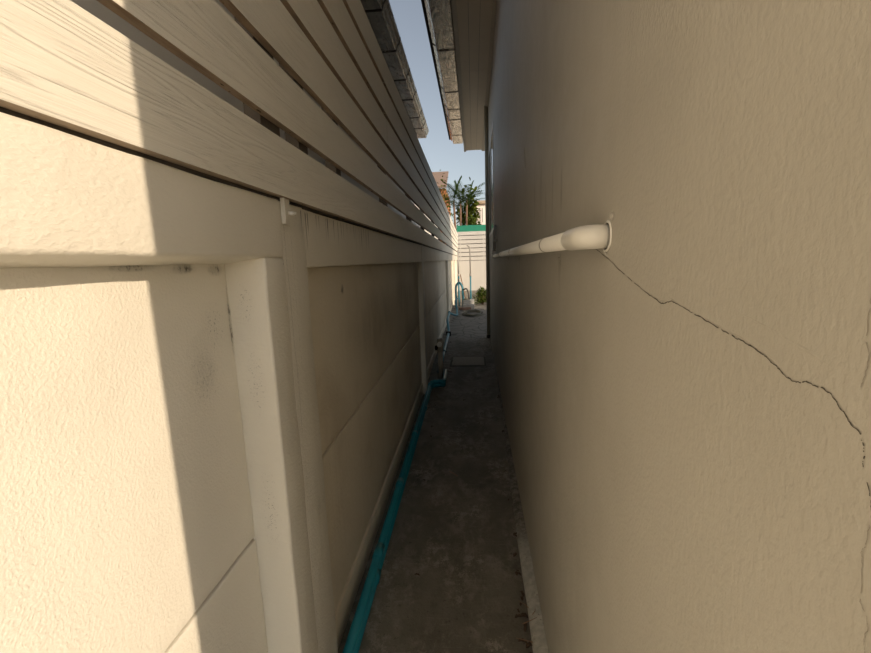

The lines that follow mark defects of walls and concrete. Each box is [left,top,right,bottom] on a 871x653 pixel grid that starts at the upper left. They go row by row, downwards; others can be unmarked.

crack [596,249,871,653]